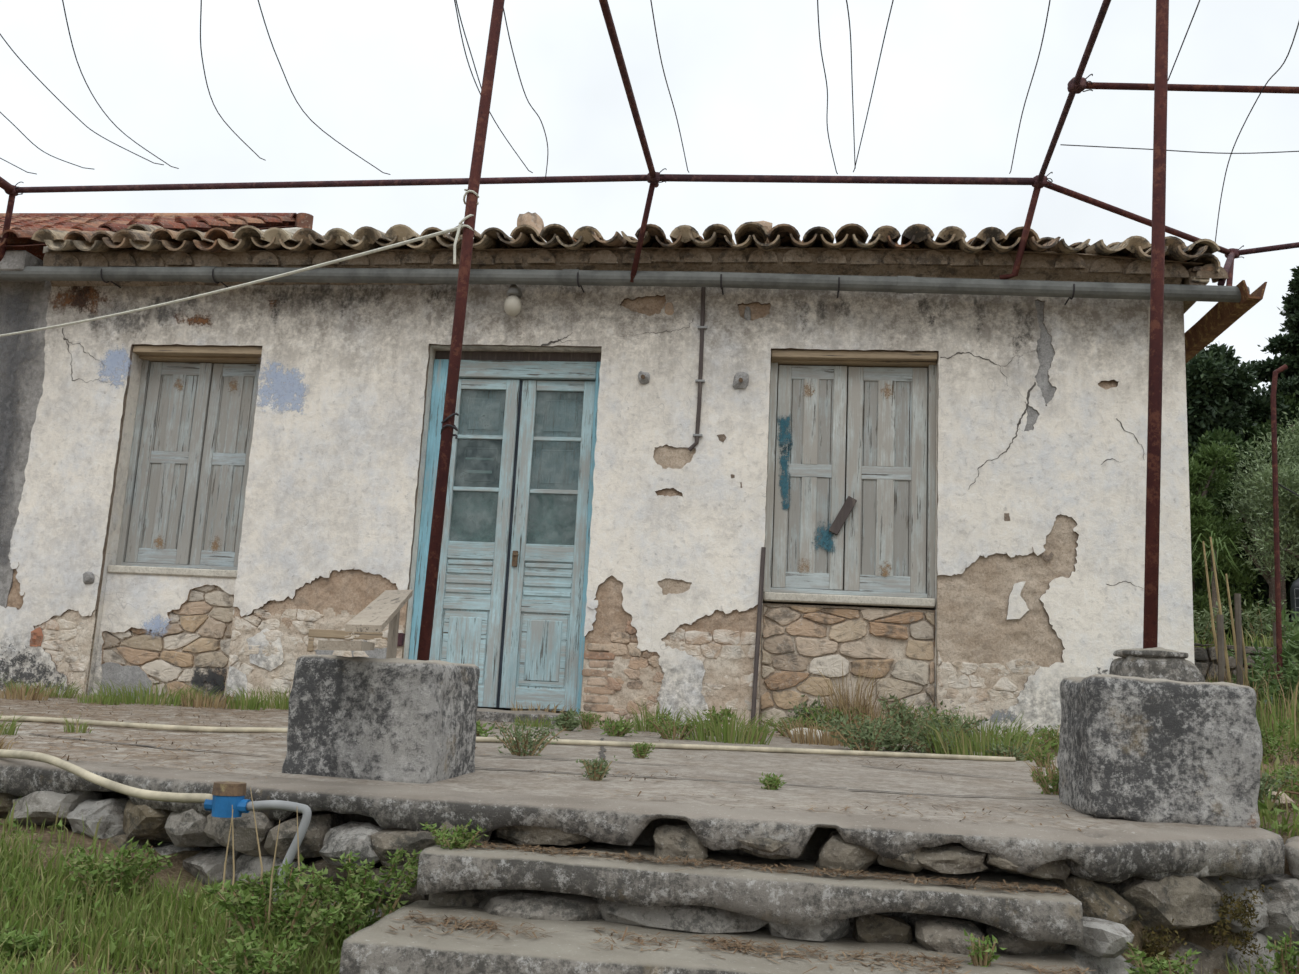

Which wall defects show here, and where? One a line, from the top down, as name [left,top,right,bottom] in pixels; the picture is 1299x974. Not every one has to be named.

spalling [653,445,696,469]
crack [940,352,1036,488]
flaking render [7,561,25,609]
flaking render [30,605,97,696]
flaking render [224,565,407,705]
flaking render [581,576,762,731]
flaking render [937,515,1078,725]